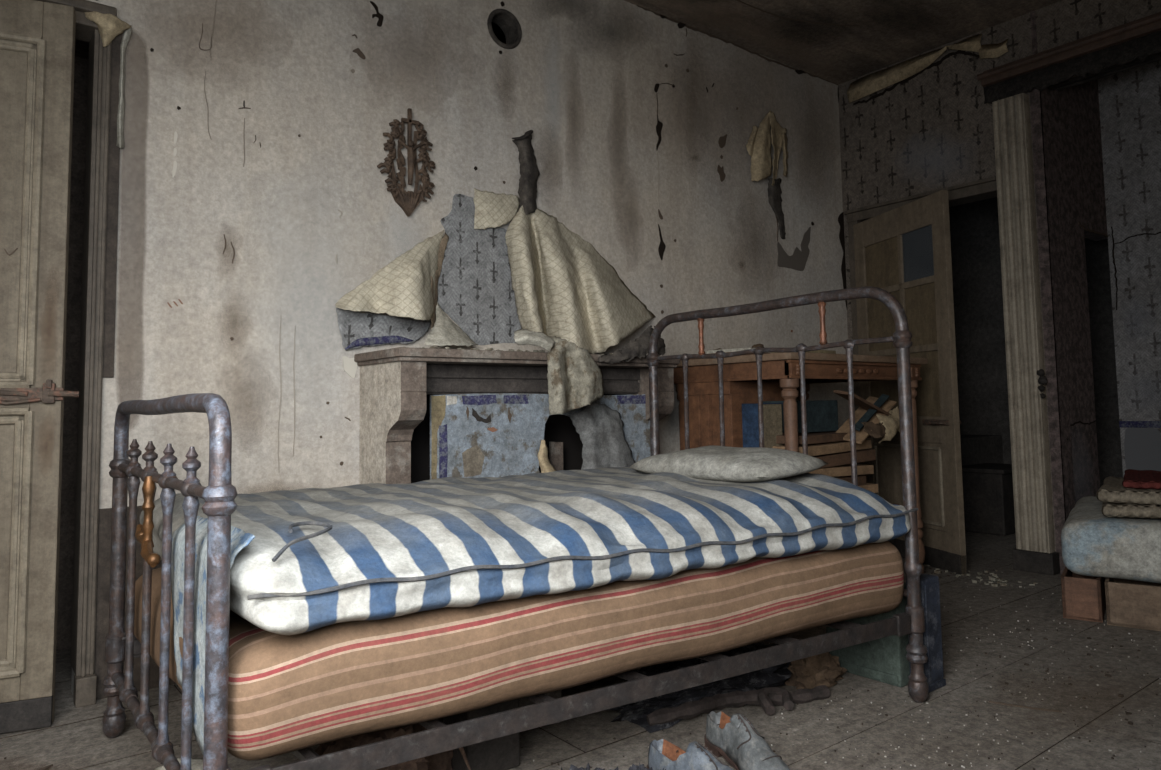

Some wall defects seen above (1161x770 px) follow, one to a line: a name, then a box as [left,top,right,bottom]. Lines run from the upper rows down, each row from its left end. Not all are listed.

peeling [838,34,1008,103]
flaking render [658,209,676,260]
flaking render [777,227,811,271]